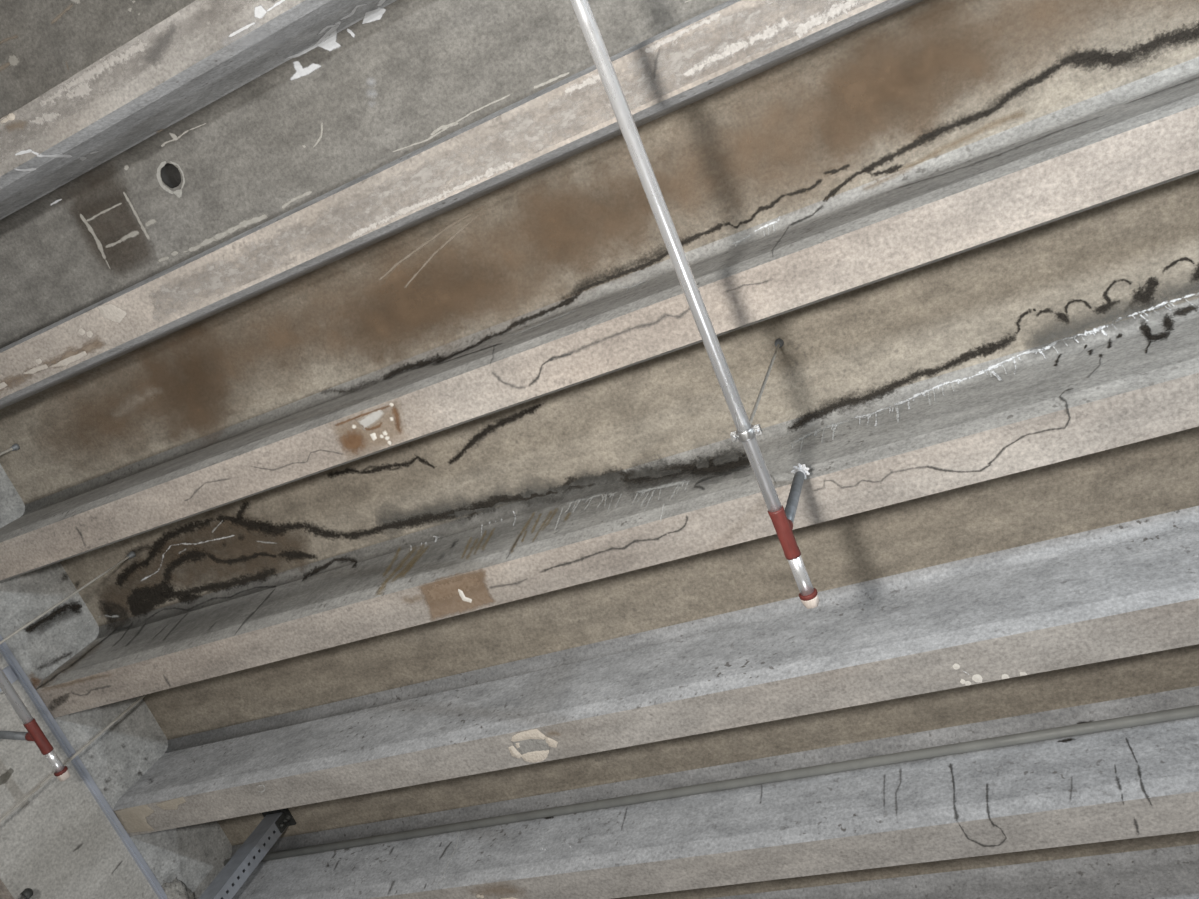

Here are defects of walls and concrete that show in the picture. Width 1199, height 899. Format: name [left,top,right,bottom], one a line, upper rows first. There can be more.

peeling [0,27,183,158]
water stain [393,94,511,152]
water stain [655,0,1199,246]
water stain [80,183,669,443]
crack [494,284,698,388]
water stain [789,257,1199,452]
water stain [449,403,544,464]
crack [818,367,1098,490]
crack [494,516,688,587]
spalling [508,729,558,763]
crack [949,764,1006,847]
crack [1114,739,1152,833]